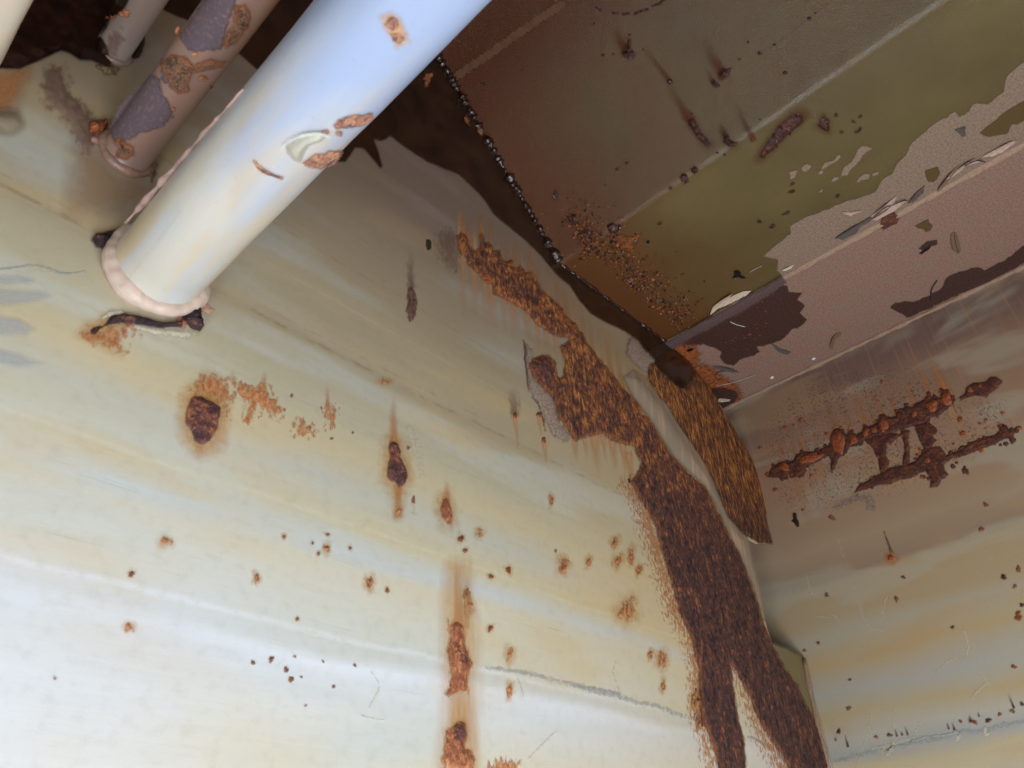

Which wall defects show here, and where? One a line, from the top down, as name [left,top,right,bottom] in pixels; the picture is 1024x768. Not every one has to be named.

corrosion [746,114,803,159]
peeling [947,141,1017,179]
peeling [835,185,925,240]
corrosion [406,279,417,322]
peeling [710,291,751,315]
corrosion [186,373,340,444]
peeling [526,345,571,442]
corrosion [934,377,1004,455]
corrosion [388,426,410,494]
corrosion [441,494,453,524]
corrosion [456,223,934,768]
corrosion [441,581,475,768]